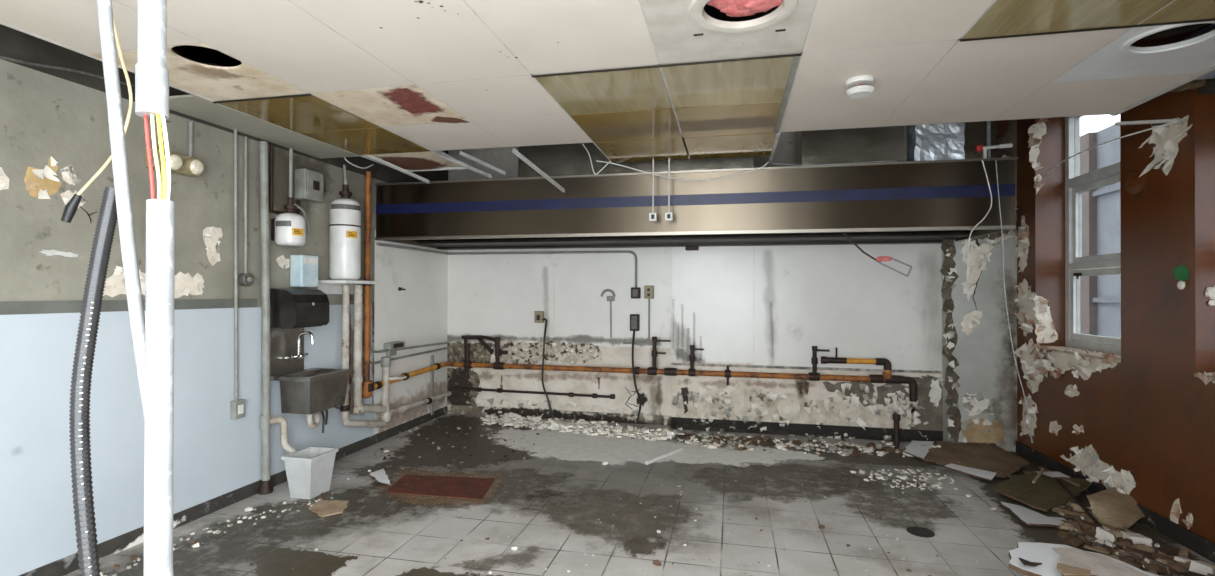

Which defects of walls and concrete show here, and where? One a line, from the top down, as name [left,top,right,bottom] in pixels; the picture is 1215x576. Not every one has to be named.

leakage [382,88,443,115]
peeling [0,156,88,208]
peeling [1027,118,1049,194]
peeling [1139,115,1192,177]
peeling [203,226,223,266]
peeling [103,266,126,297]
peeling [174,271,204,298]
peeling [672,187,1136,495]
flaking render [447,339,652,424]
peeling [1197,372,1215,385]